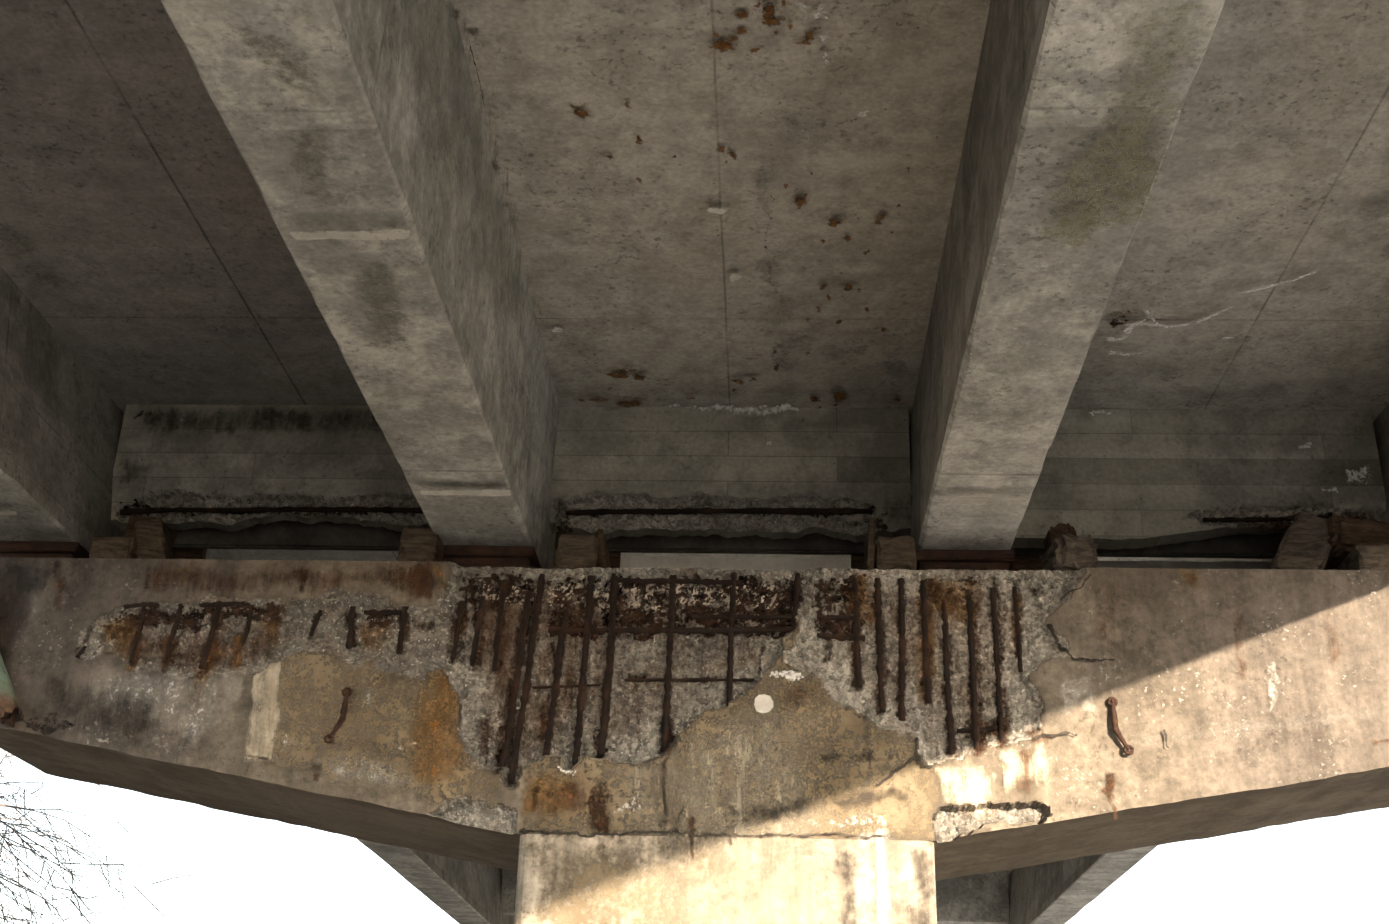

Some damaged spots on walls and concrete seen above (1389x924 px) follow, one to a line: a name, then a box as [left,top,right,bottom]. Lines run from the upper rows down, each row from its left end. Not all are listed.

rust [709,0,821,53]
crack [1099,271,1316,371]
rust [578,369,646,407]
spalling [115,489,428,526]
spalling [550,492,888,536]
crack [1047,574,1115,662]
spalling [75,562,1085,790]
spalling [429,797,516,834]
spalling [932,803,1048,843]